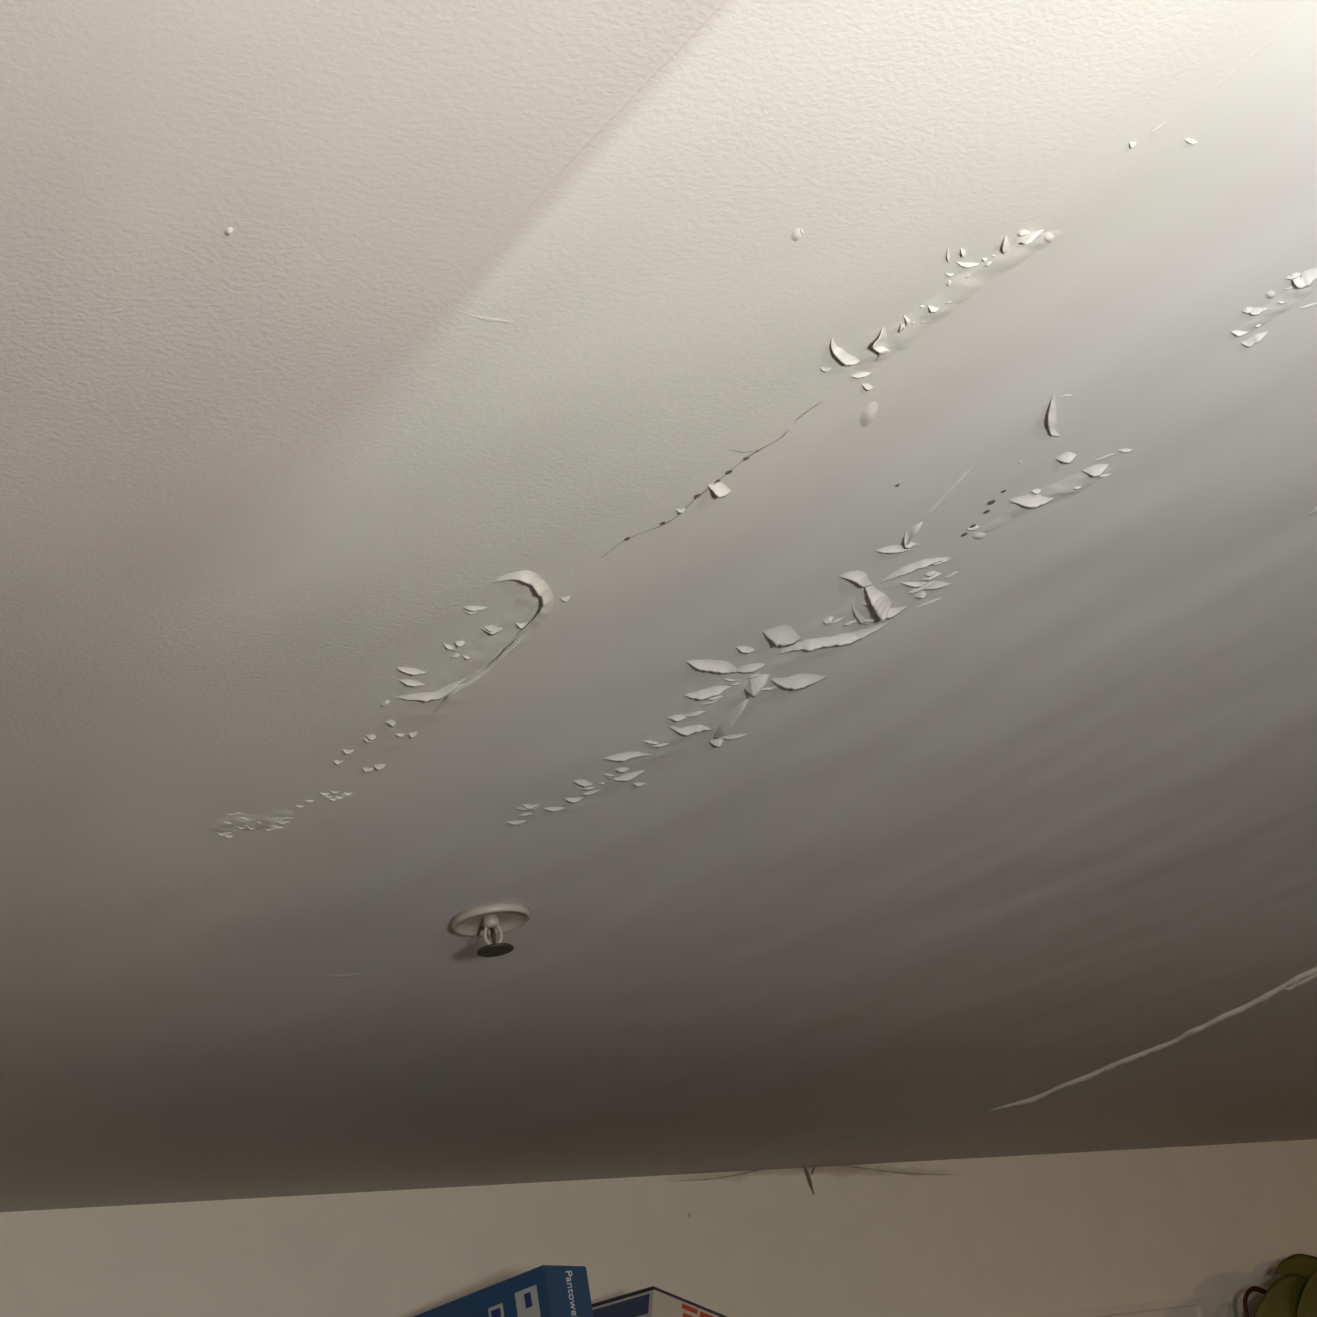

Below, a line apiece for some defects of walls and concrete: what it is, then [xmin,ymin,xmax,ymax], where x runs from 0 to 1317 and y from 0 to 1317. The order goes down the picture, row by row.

peeling [820,229,1063,427]
peeling [1231,267,1317,347]
crack [603,401,823,557]
peeling [333,570,570,772]
peeling [507,466,973,825]
crack [986,967,1317,1112]